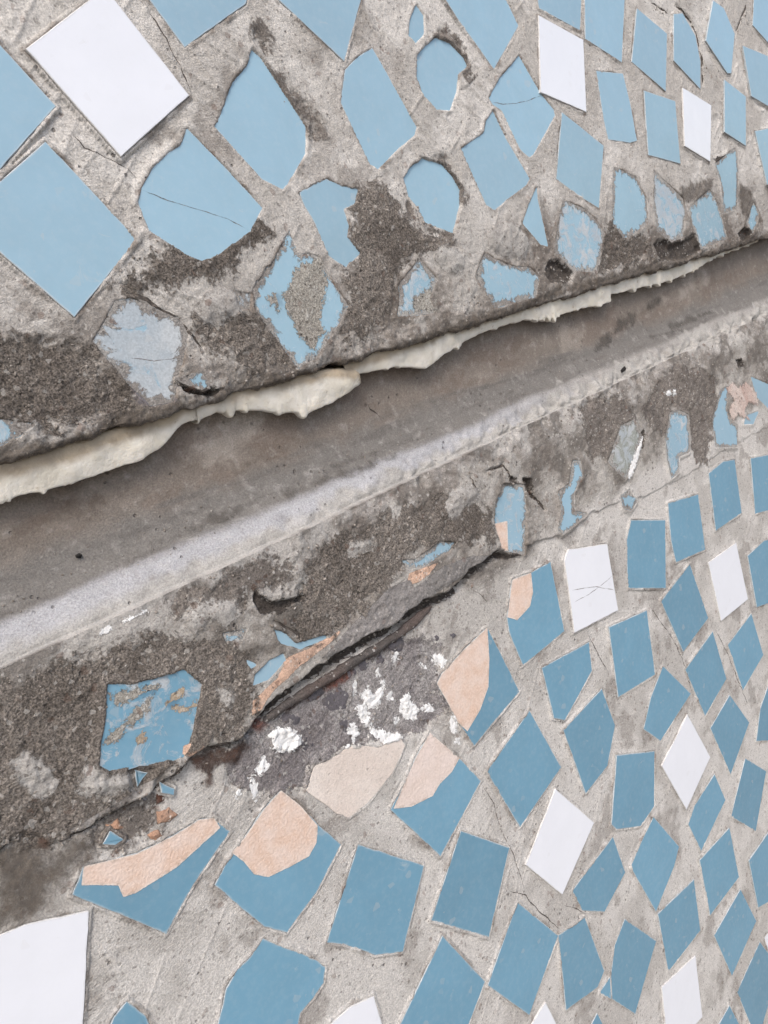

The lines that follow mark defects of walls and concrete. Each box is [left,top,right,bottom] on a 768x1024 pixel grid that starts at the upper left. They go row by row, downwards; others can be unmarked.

spalling [106,218,276,301]
spalling [337,179,456,343]
spalling [545,258,572,283]
spalling [597,221,700,274]
spalling [190,310,290,379]
spalling [0,327,135,444]
crack [470,464,544,510]
crack [257,550,521,717]
spalling [0,491,498,867]
crack [208,740,239,749]
crack [69,766,184,836]